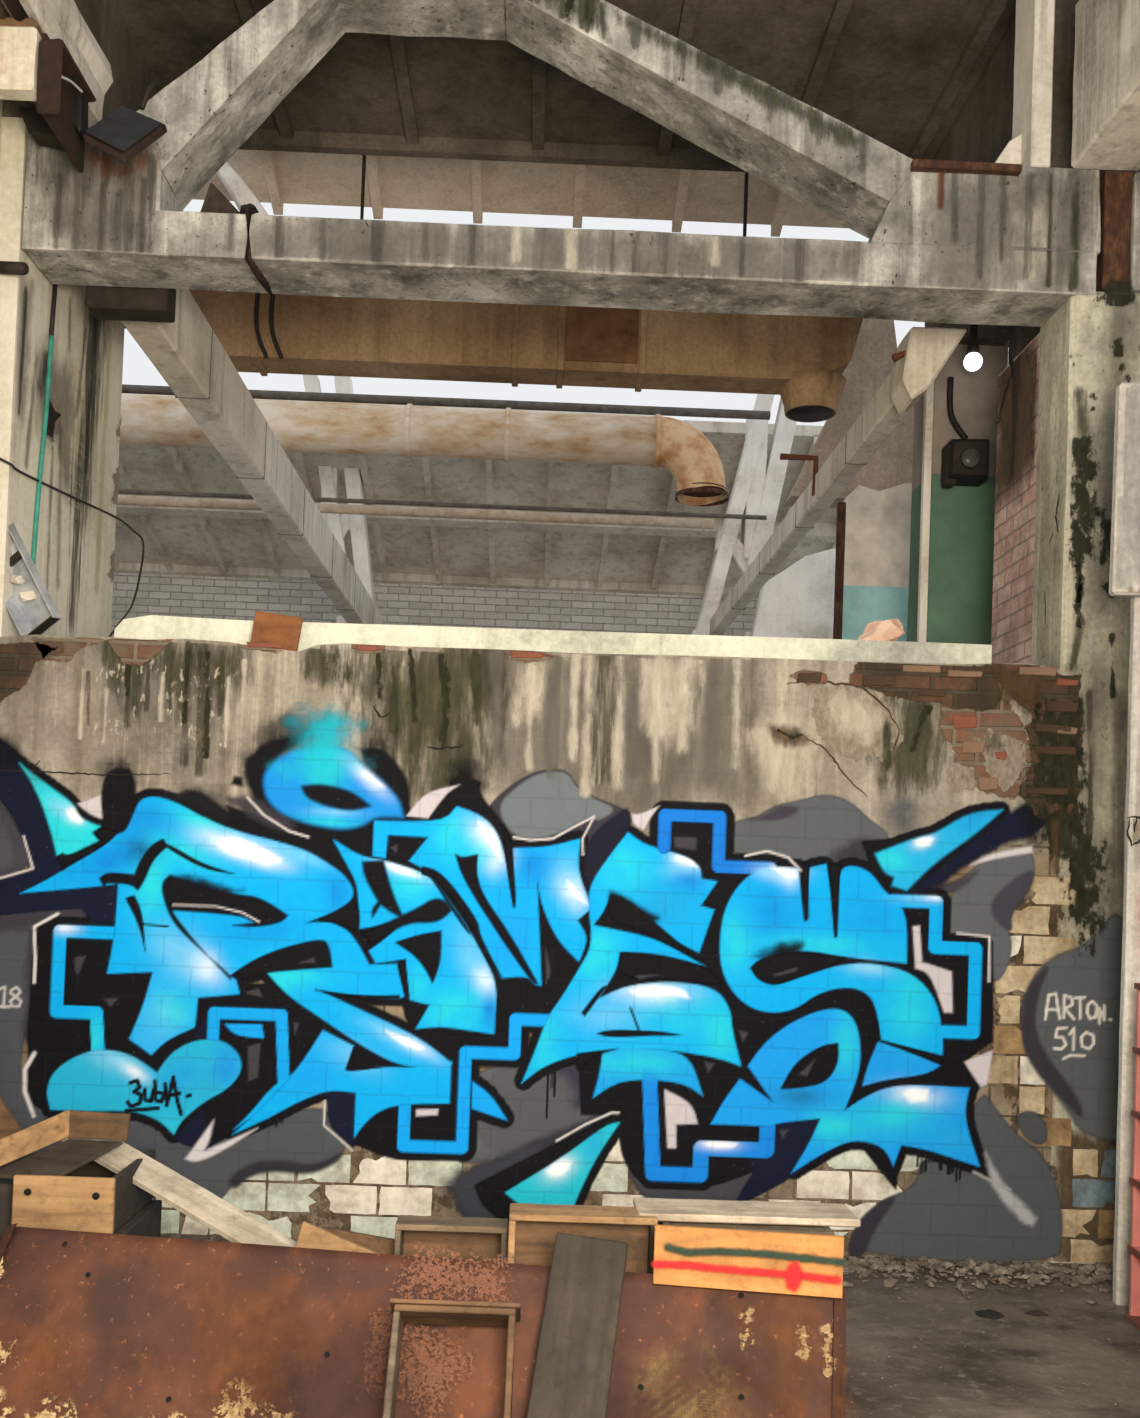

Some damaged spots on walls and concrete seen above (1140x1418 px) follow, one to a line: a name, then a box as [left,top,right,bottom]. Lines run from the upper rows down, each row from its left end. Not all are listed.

corrosion [910,159,1022,176]
spalling [111,468,119,504]
spalling [107,550,115,582]
flaking render [0,637,172,702]
damp [80,641,228,775]
damp [376,648,418,734]
damp [438,653,451,743]
damp [470,652,738,793]
flaking render [790,662,1088,829]
peeling [966,876,1117,1264]